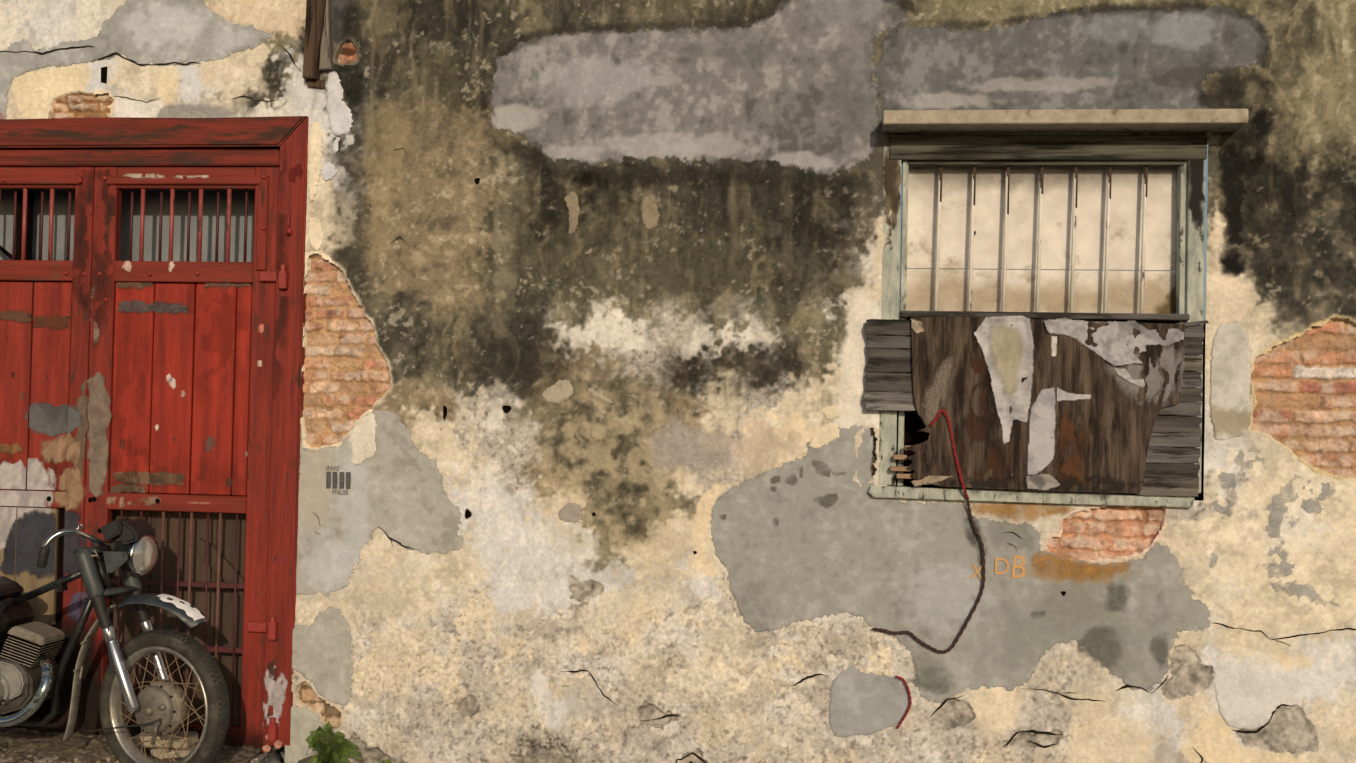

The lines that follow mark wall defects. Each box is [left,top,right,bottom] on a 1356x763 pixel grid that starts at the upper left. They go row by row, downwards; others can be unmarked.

damp [1052,2,1207,15]
damp [524,25,612,43]
crack [0,45,201,66]
damp [334,65,363,103]
peeling [289,42,358,202]
damp [1199,25,1356,283]
spalling [300,218,391,465]
spalling [1250,319,1356,480]
damp [770,461,831,492]
damp [820,494,838,507]
spalling [1046,505,1166,561]
crack [1211,623,1356,646]